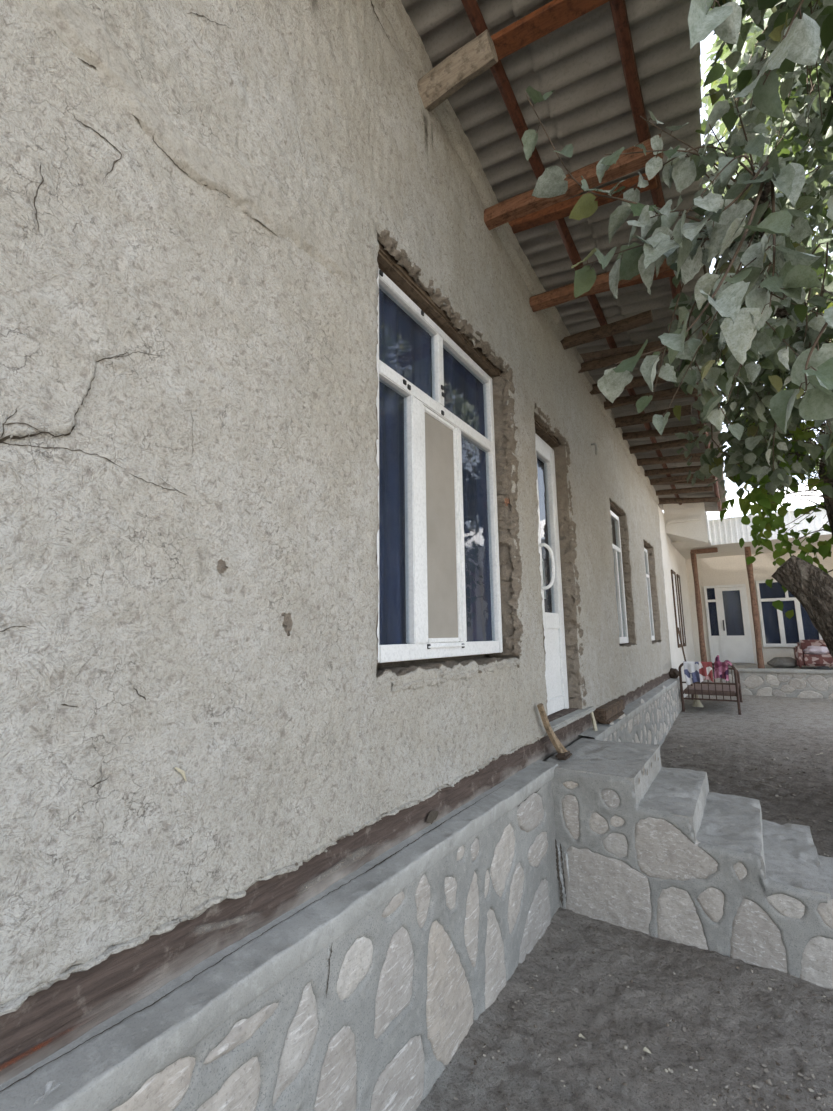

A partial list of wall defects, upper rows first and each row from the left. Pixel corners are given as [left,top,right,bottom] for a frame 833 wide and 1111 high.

crack [371,1,399,55]
crack [34,165,44,230]
crack [74,117,122,177]
crack [153,136,230,198]
crack [0,351,186,495]